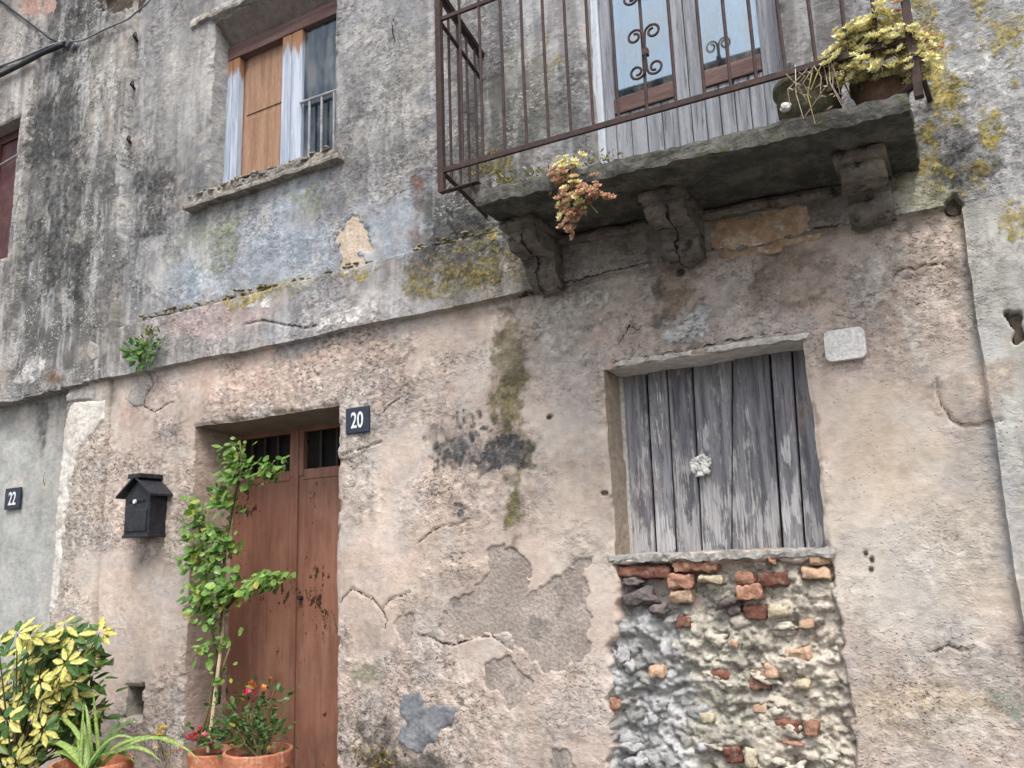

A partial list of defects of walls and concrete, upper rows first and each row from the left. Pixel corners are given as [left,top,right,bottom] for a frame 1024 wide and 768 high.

damp [22,40,89,332]
damp [134,163,176,237]
mould [929,136,1001,188]
spalling [334,215,373,274]
damp [423,210,503,263]
spalling [708,205,822,260]
mould [423,409,535,475]
crack [341,589,410,628]
spalling [439,544,593,710]